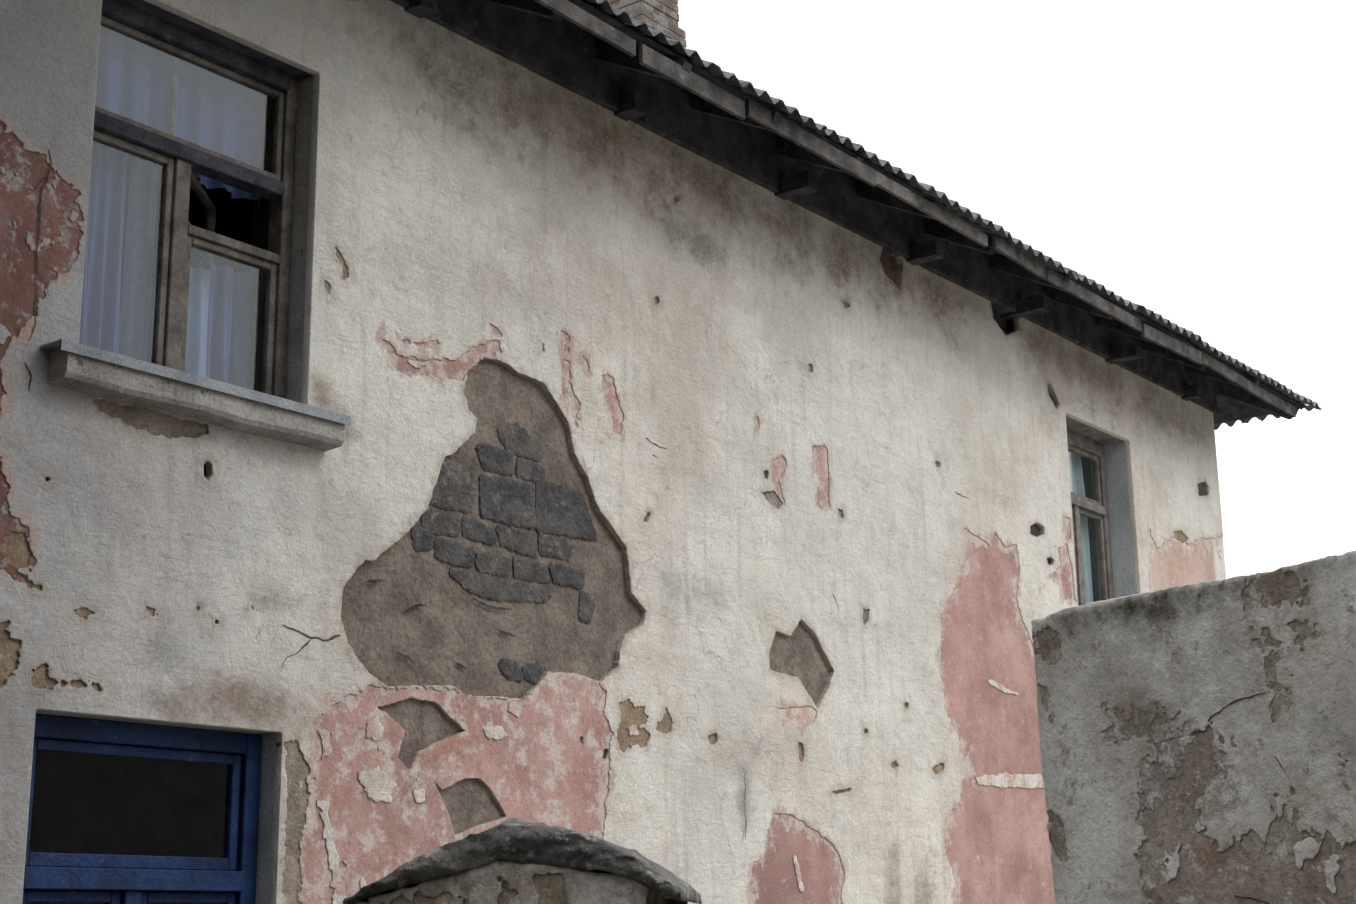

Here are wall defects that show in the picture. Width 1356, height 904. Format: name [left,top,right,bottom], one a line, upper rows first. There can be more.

peeling [0,121,84,411]
peeling [0,457,41,591]
peeling [0,620,100,692]
crack [281,625,340,670]
flaking render [276,324,672,904]
flaking render [769,622,830,727]
peeling [939,528,1069,904]
peeling [1149,529,1226,592]
crack [1208,692,1267,722]
peeling [1241,569,1321,723]
peeling [748,813,844,904]
peeling [1102,702,1356,904]